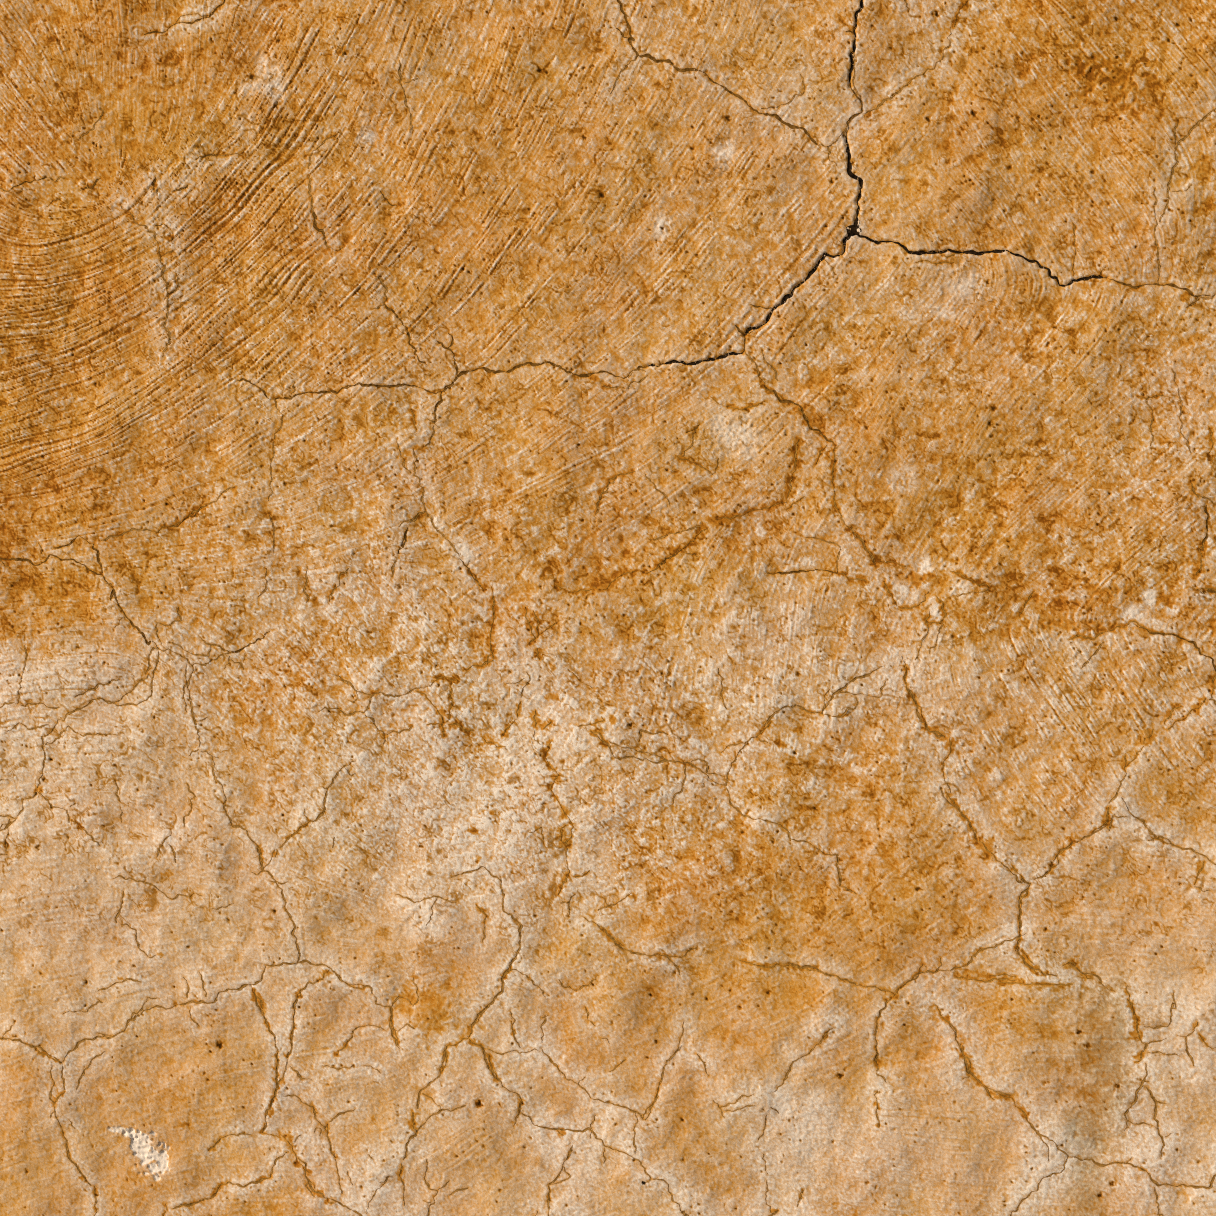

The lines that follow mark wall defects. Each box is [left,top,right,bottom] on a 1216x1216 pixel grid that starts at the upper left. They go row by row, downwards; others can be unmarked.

crack [0,81,264,385]
crack [124,0,363,267]
crack [359,46,437,239]
crack [1130,359,1216,610]
crack [288,546,368,618]
crack [1001,573,1049,638]
crack [0,467,337,1216]
crack [525,706,579,857]
crack [486,1099,619,1216]
crack [597,1140,734,1216]
crack [663,1026,837,1216]
crack [1070,962,1216,1216]